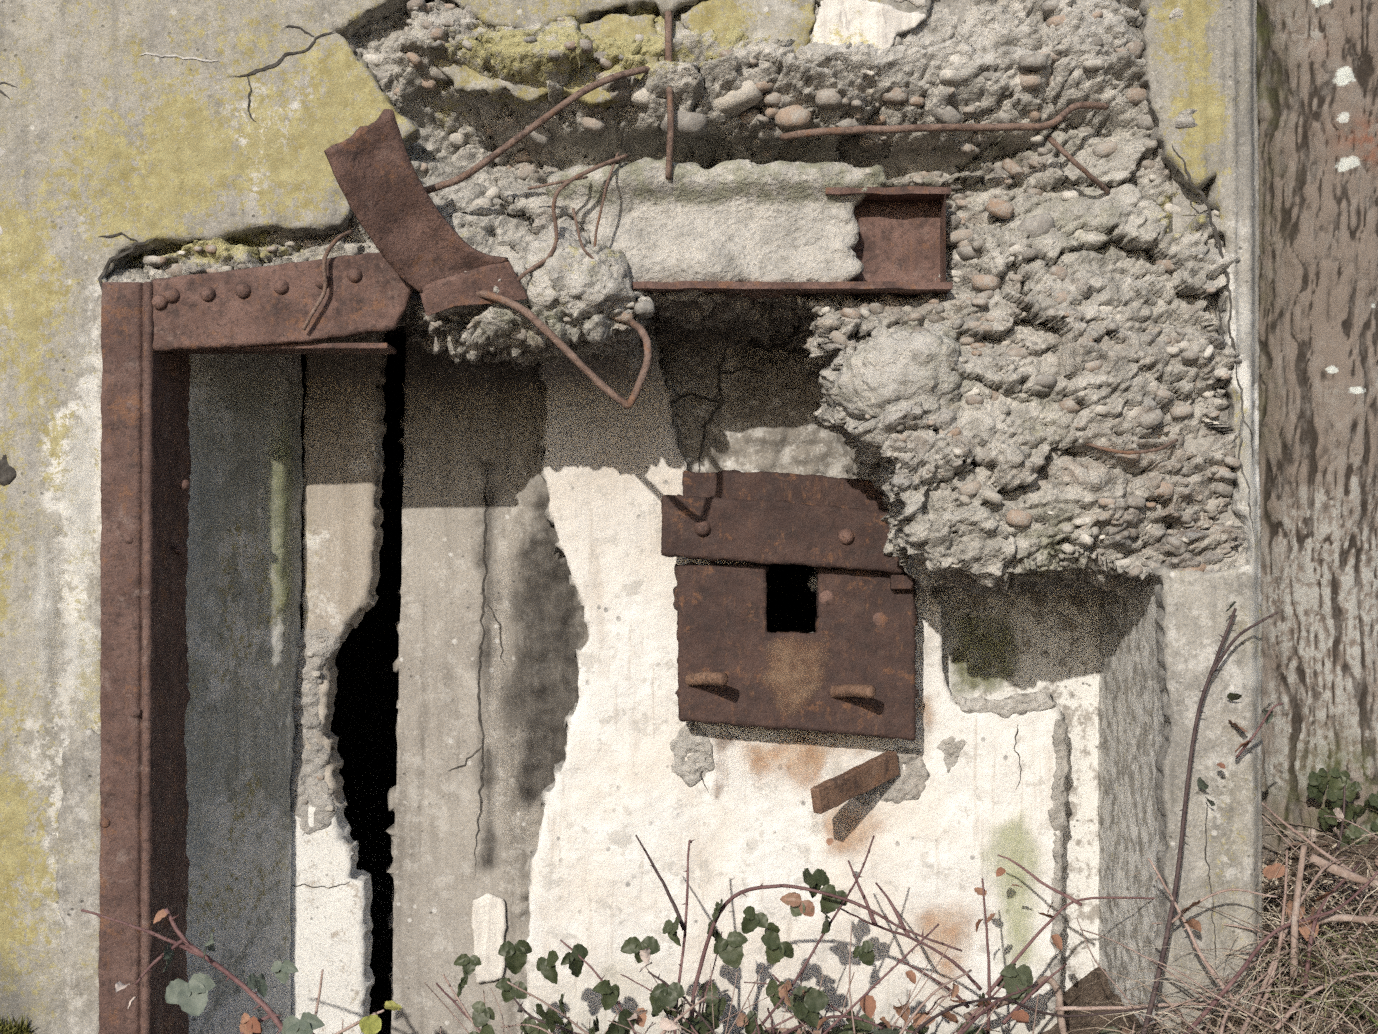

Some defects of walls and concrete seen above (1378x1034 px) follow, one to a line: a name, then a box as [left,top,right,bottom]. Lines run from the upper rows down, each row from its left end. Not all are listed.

crack [140,25,337,124]
spalling [106,213,379,283]
spalling [345,0,1250,598]
leakage [35,551,51,623]
corrosion [770,642,819,709]
spalling [290,628,341,836]
peeling [471,893,507,983]